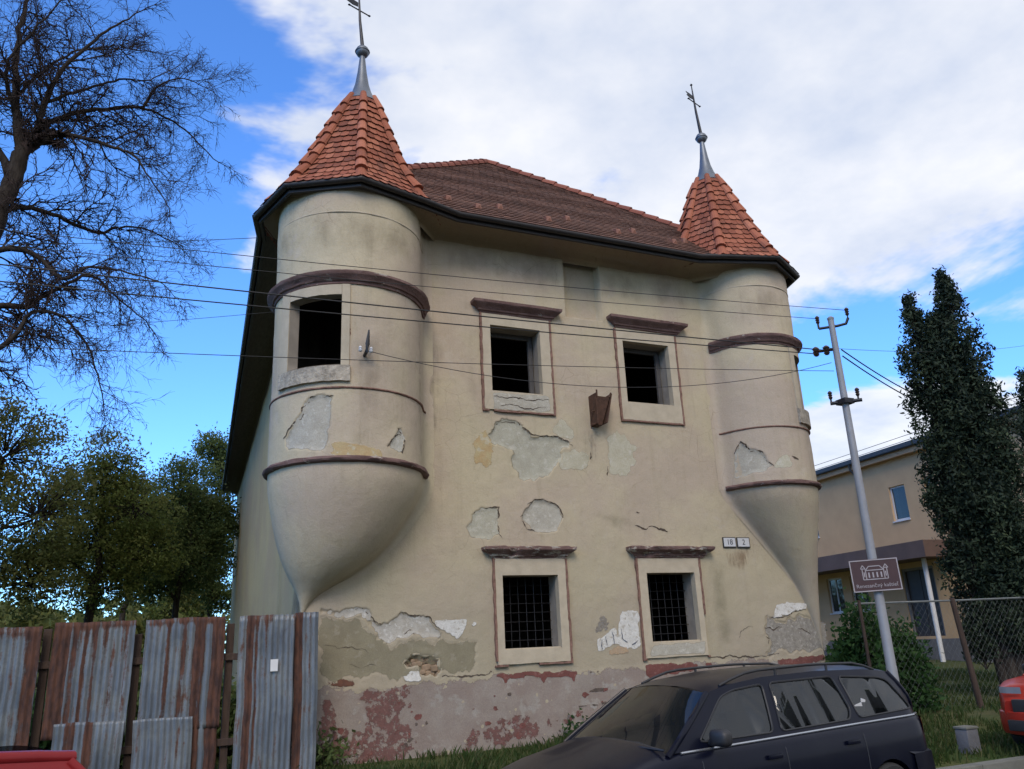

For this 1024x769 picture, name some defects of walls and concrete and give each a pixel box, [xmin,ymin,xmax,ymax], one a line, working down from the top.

peeling [283,395,334,451]
peeling [388,428,406,453]
peeling [488,419,572,481]
peeling [734,441,774,478]
peeling [520,499,563,532]
peeling [327,607,476,643]
peeling [771,602,807,618]
peeling [316,656,440,765]
peeling [464,670,583,751]